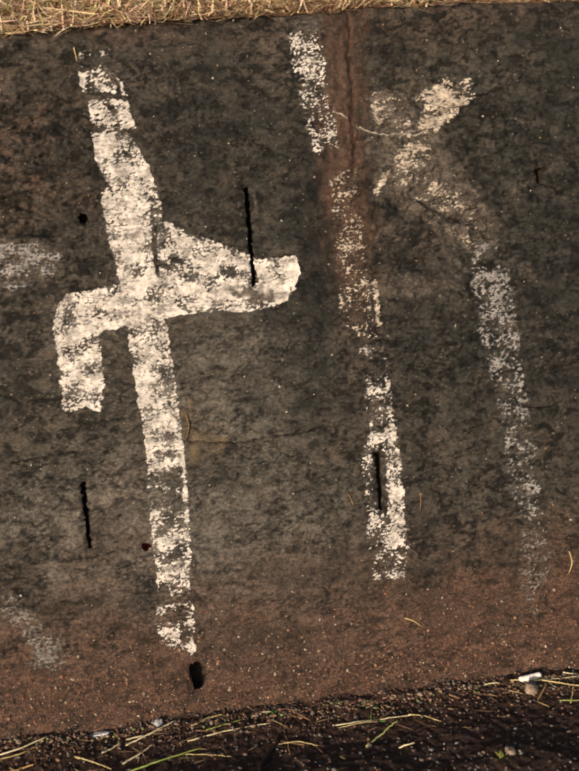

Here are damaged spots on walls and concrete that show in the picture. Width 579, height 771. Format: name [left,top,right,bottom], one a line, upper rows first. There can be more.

corrosion [313,9,378,322]